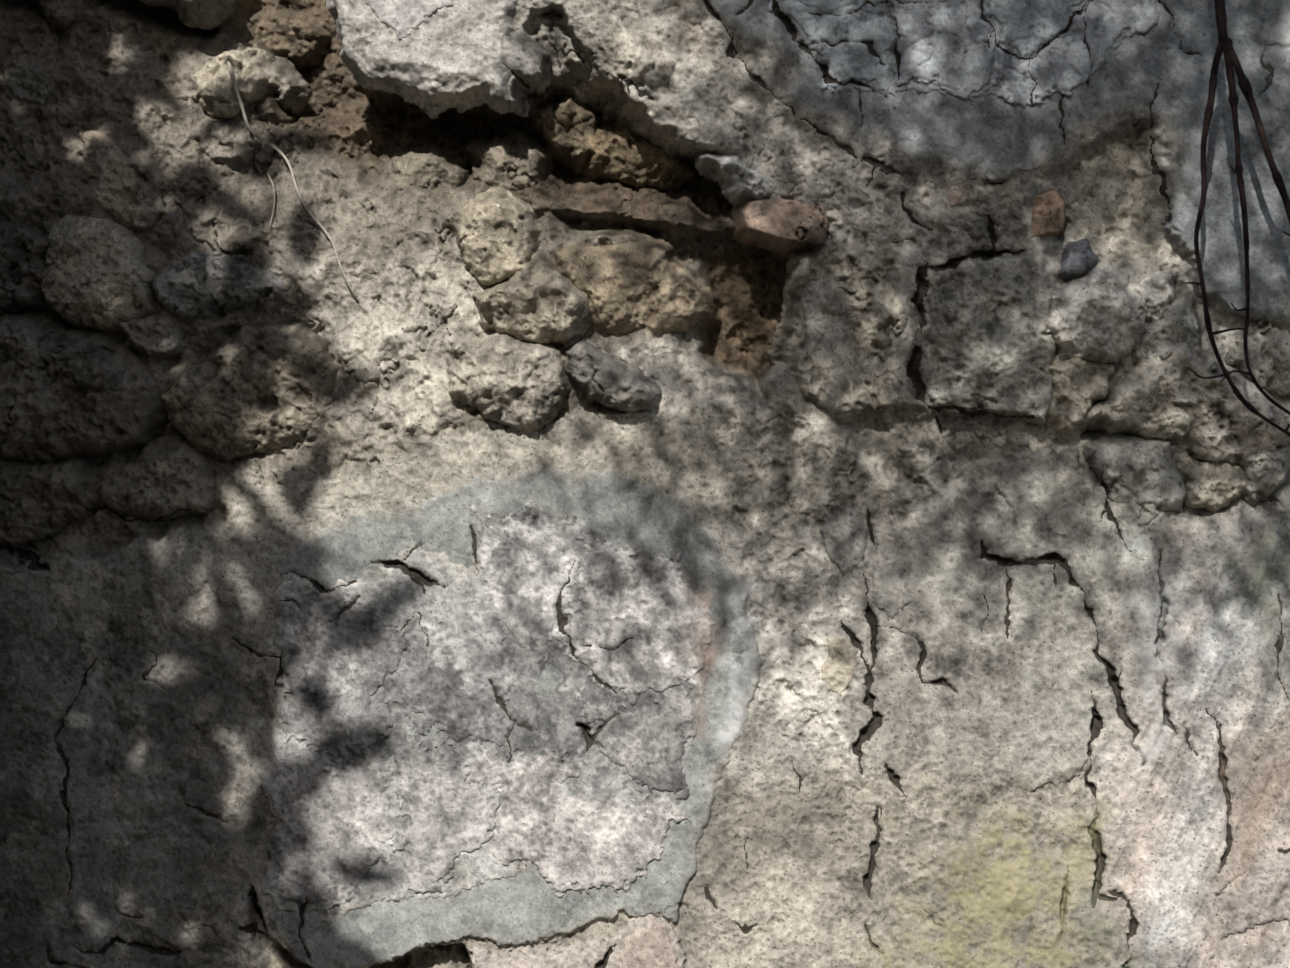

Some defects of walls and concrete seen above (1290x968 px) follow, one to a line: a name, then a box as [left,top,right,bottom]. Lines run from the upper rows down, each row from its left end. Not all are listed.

crack [980,0,1094,156]
crack [1158,0,1202,56]
crack [703,0,1035,439]
flaking render [220,457,385,521]
crack [279,542,446,659]
crack [469,525,479,574]
crack [488,679,533,763]
crack [556,560,634,754]
crack [841,509,959,959]
crack [980,475,1245,968]